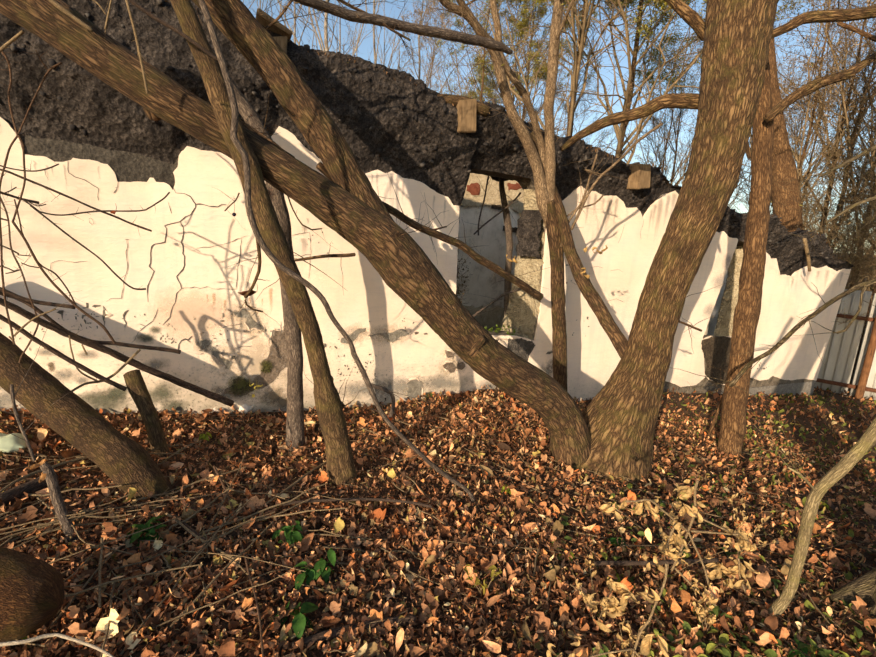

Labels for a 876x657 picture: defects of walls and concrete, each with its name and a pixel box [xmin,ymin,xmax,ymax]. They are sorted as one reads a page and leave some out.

flaking render [24,135,179,189]
flaking render [466,183,480,195]
crack [135,190,245,339]
water stain [138,328,160,342]
water stain [82,388,126,408]
water stain [150,385,181,412]